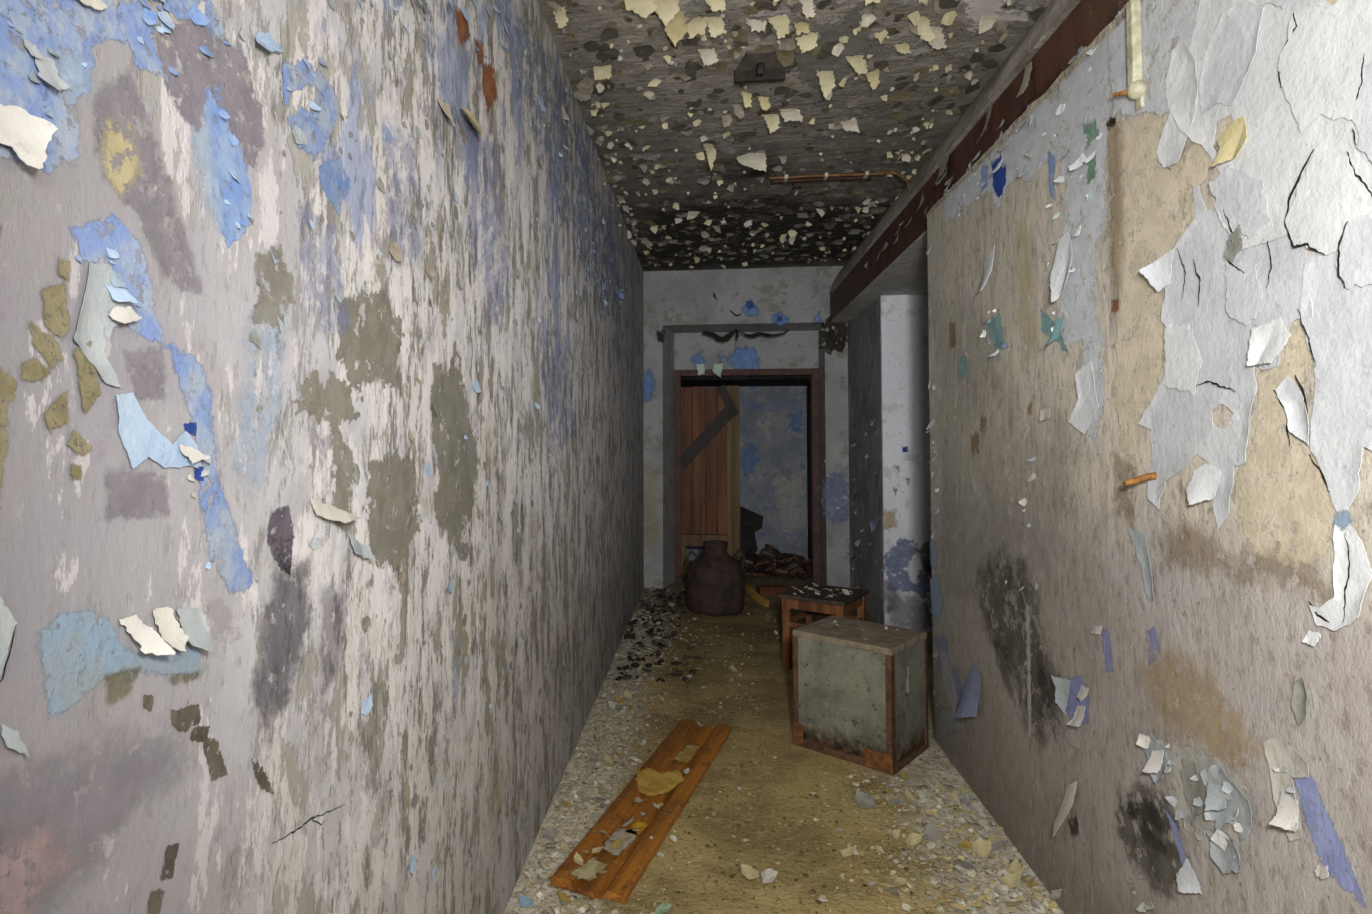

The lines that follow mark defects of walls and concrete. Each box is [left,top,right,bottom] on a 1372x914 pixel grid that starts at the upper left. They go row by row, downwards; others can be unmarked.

peeling [0,0,357,593]
spalling [267,0,1045,833]
peeling [0,597,17,682]
peeling [38,607,214,716]
spalling [148,843,179,914]
spalling [171,704,227,781]
spalling [251,759,274,794]
damp [981,560,1056,739]
peeling [1053,781,1079,836]
peeling [1051,675,1090,750]
damp [1115,785,1182,912]
peeling [1136,732,1365,906]